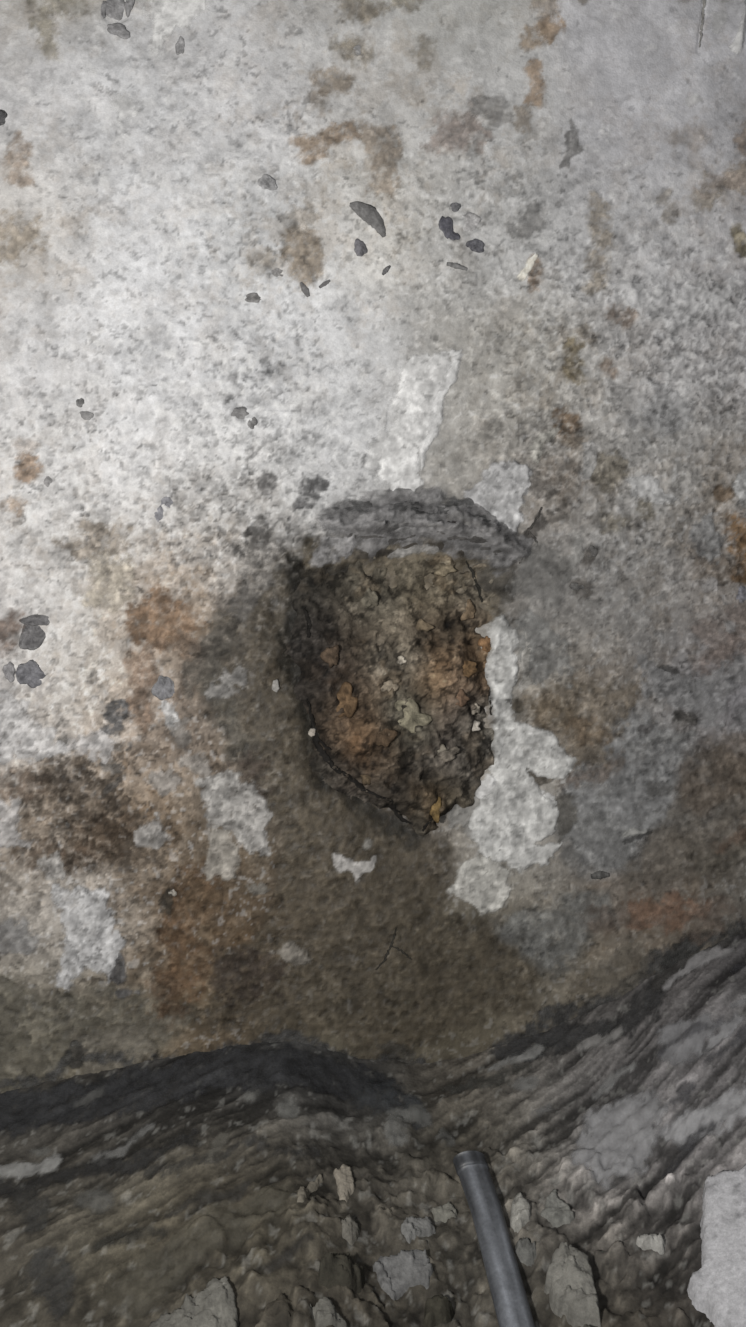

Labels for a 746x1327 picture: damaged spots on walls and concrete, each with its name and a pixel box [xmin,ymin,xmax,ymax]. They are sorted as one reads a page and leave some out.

crack [698,0,706,47]
flaking render [231,406,257,429]
flaking render [154,497,173,523]
spalling [258,474,276,493]
flaking render [626,475,687,504]
corrosion [696,485,746,583]
flaking render [287,350,578,914]
flaking render [0,614,131,794]
flaking render [149,516,281,880]
flaking render [134,812,168,849]
water stain [0,538,746,1231]
water stain [95,1181,286,1318]